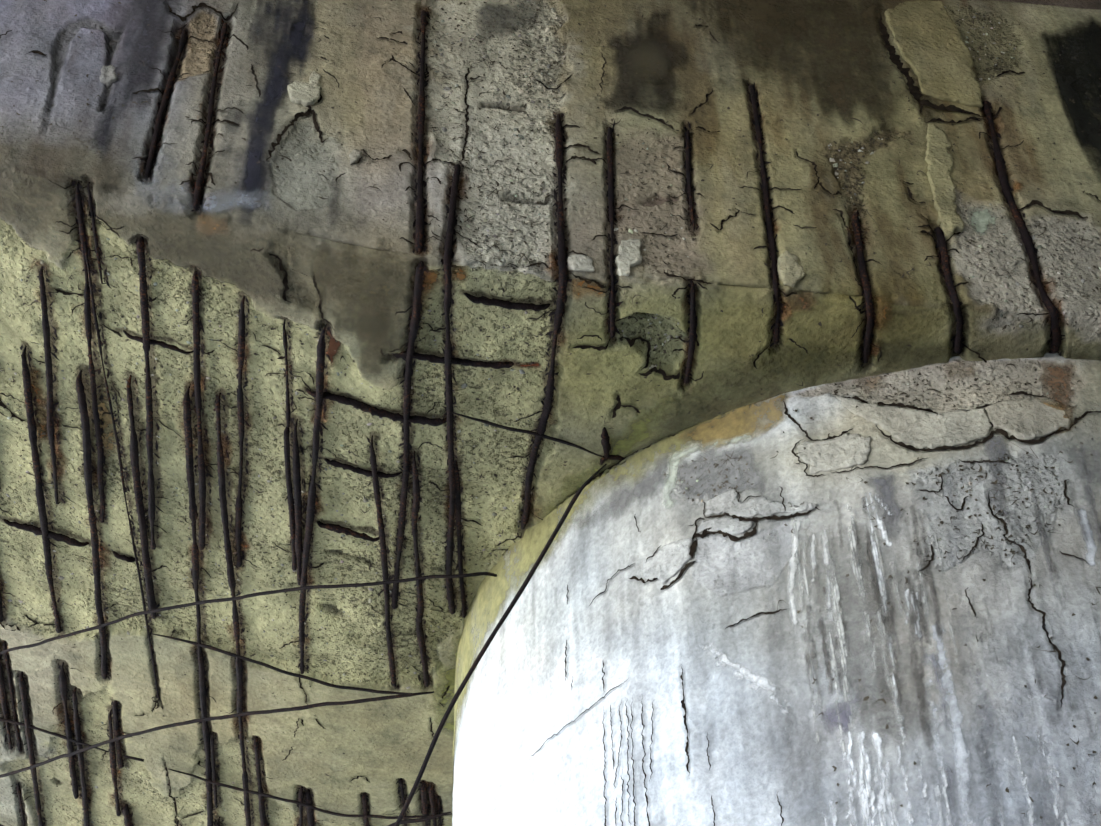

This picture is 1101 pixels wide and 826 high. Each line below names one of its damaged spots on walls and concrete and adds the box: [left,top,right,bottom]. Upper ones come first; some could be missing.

leakage [203,0,314,213]
leakage [604,13,687,111]
leakage [1043,18,1101,173]
corrosion [97,382,118,456]
corrosion [325,330,341,366]
spalling [0,0,713,826]
spalling [708,82,817,348]
spalling [786,0,1101,584]
corrosion [1041,363,1073,432]
crack [566,487,820,606]
crack [725,608,788,629]
crack [783,391,1101,709]